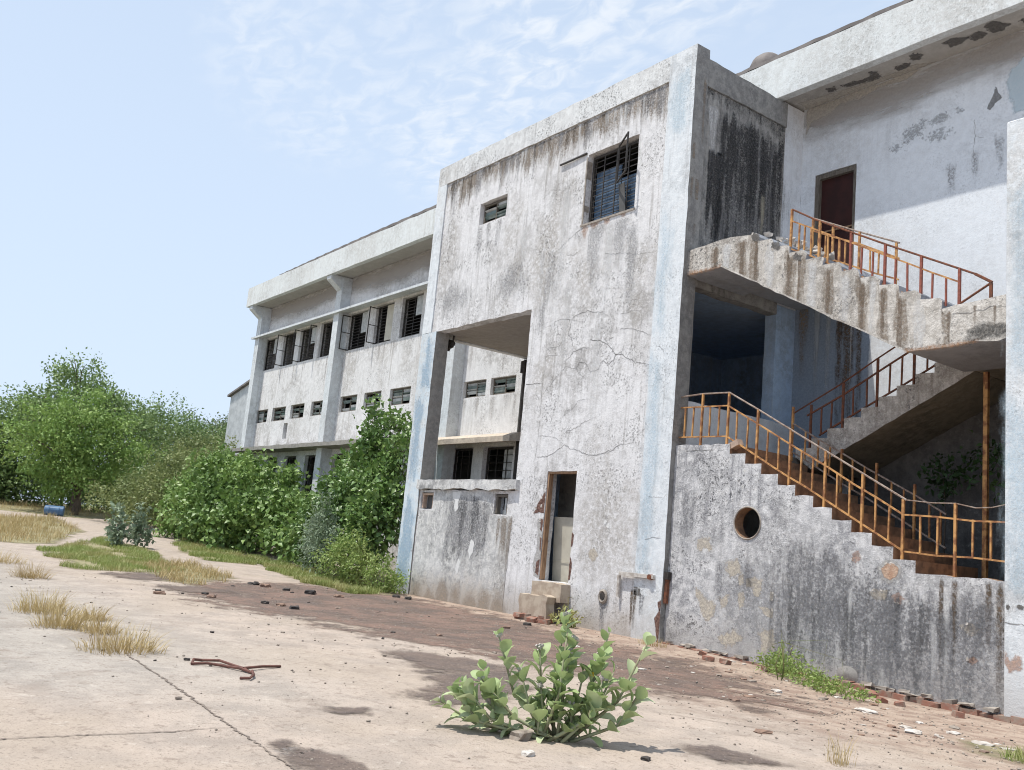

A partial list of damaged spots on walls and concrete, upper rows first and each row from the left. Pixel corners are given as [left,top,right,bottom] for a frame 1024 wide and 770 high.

flaking render [825,71,882,92]
flaking render [893,52,923,71]
flaking render [942,18,1024,47]
peeling [987,57,1024,112]
water stain [447,83,669,206]
flaking render [892,107,964,152]
water stain [690,81,924,417]
mould [968,305,1006,343]
crack [526,310,663,489]
water stain [444,498,512,556]
flaking render [532,493,545,577]
water stain [717,548,1005,714]